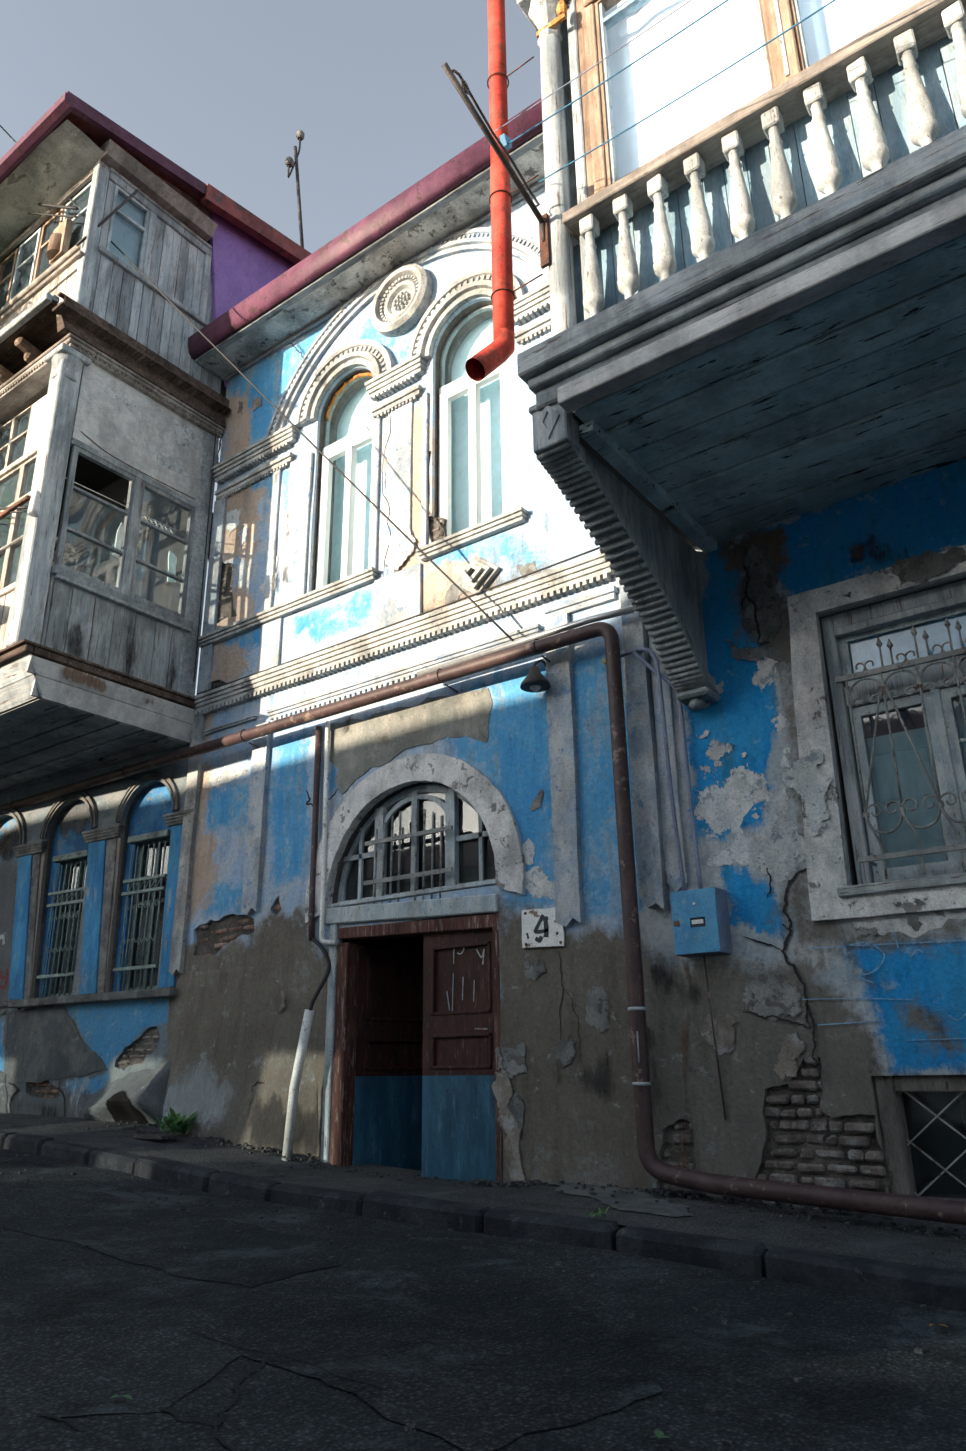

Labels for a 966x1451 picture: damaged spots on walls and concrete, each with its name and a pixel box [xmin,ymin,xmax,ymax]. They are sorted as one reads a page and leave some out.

flaking render [208,509,278,623]
crack [741,566,770,644]
flaking render [891,547,966,585]
flaking render [324,688,492,794]
peeling [694,711,832,883]
flaking render [196,914,254,956]
crack [743,868,821,1076]
flaking render [0,1005,160,1099]
flaking render [491,1042,527,1186]
flaking render [662,1119,696,1170]
flaking render [699,973,893,1193]